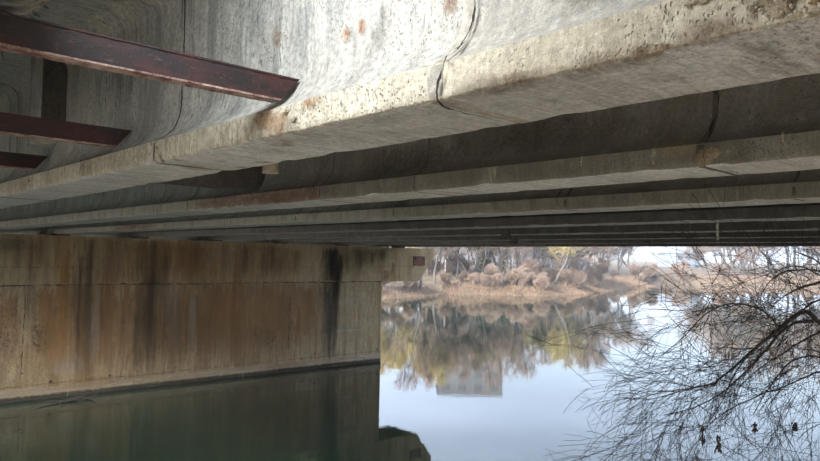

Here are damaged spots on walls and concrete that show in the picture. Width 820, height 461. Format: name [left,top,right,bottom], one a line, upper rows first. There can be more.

crack [422,0,488,119]
crack [697,90,738,173]